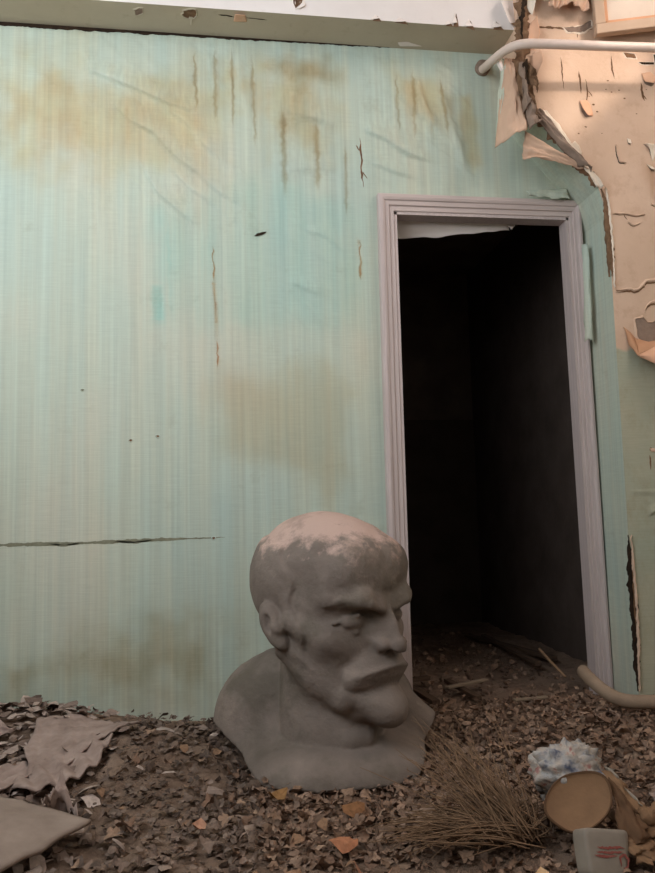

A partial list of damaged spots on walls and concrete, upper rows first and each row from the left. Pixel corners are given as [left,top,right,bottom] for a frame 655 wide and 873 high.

spalling [492,0,543,73]
spalling [562,20,593,35]
peeling [622,52,655,90]
peeling [572,96,598,154]
peeling [582,244,593,342]
peeling [616,278,655,293]
spalling [633,300,655,342]
crack [0,537,225,547]